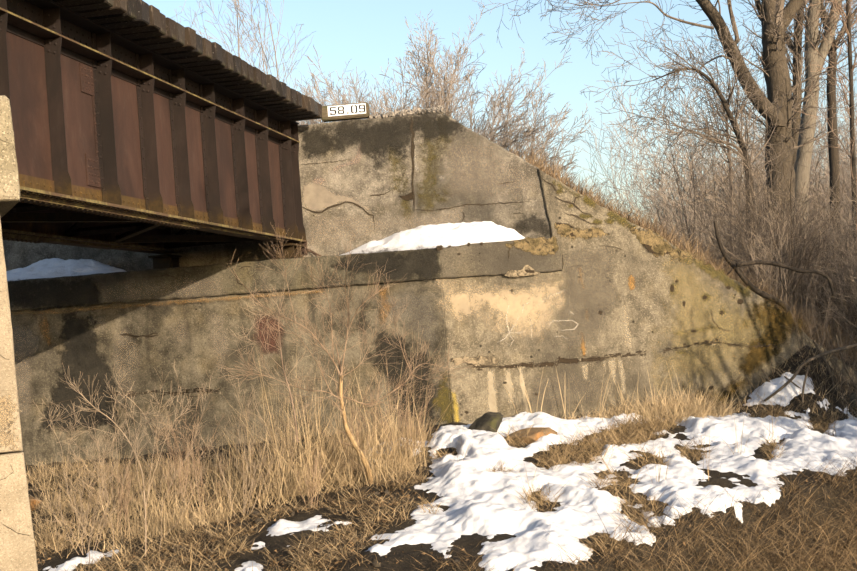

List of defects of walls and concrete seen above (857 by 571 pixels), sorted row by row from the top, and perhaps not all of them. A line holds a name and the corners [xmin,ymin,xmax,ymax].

leakage [302,110,463,168]
crack [410,116,527,221]
crack [302,190,391,231]
crack [543,179,605,225]